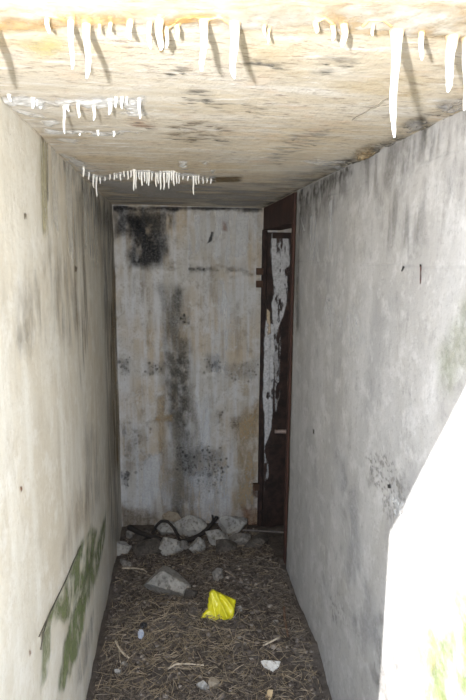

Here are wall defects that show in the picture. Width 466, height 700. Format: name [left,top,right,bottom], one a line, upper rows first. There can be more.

leakage [0,5,466,40]
leakage [64,157,351,267]
leakage [155,296,229,518]
peeling [263,238,290,444]
leakage [59,518,106,689]